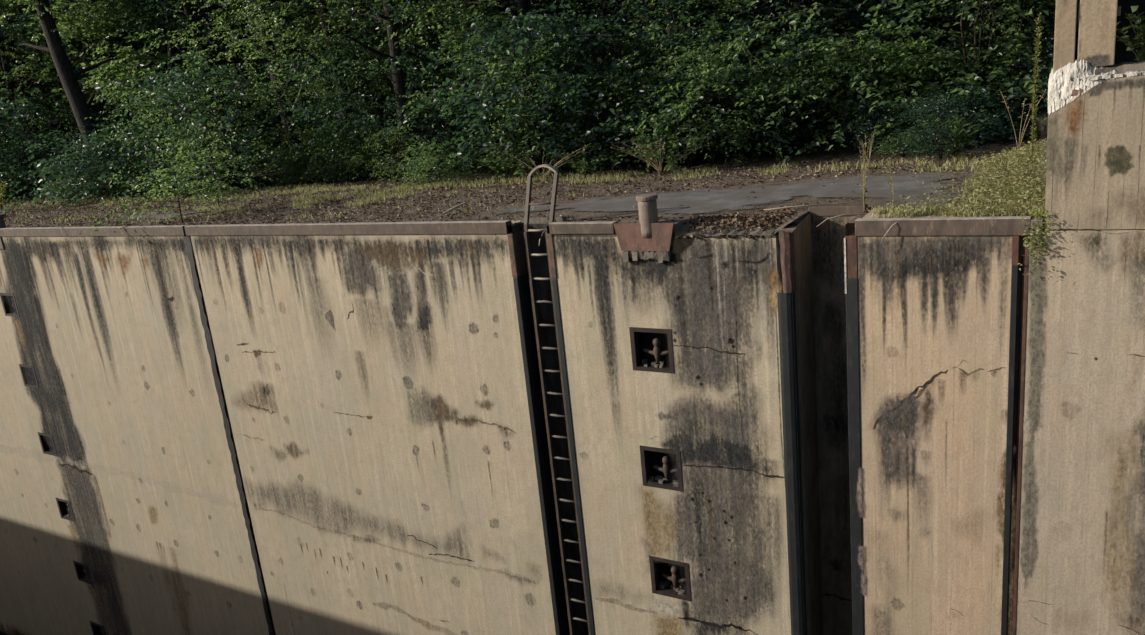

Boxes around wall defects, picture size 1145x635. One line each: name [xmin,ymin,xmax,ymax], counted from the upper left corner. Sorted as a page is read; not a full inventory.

spalling [1048,59,1119,116]
leakage [853,235,1014,377]
leakage [0,235,506,635]
crack [408,535,474,562]
leakage [556,234,779,635]
crack [678,603,757,635]
crack [673,309,785,481]
leakage [875,395,929,548]
crack [873,360,1006,431]
leakage [1128,422,1145,619]